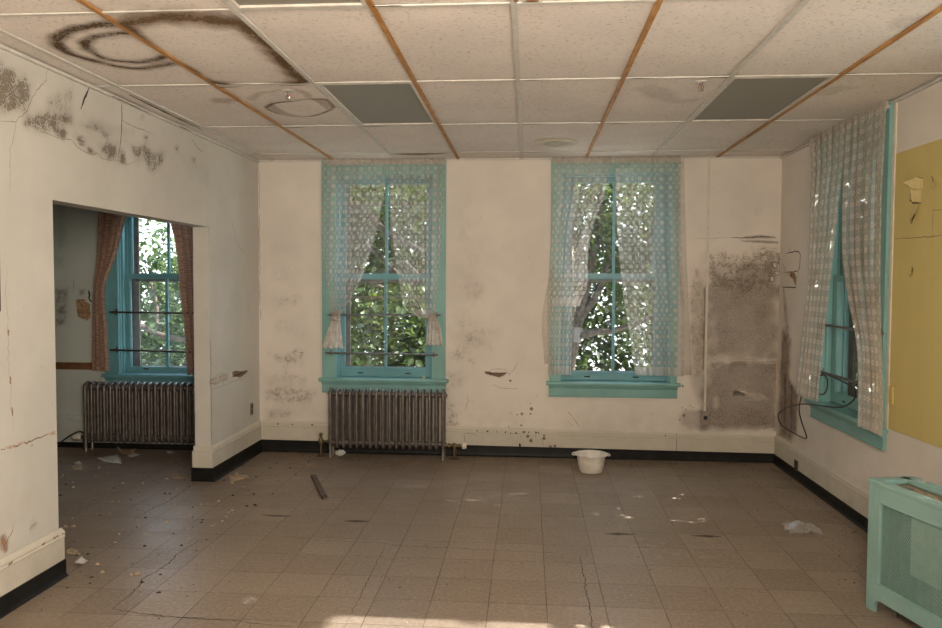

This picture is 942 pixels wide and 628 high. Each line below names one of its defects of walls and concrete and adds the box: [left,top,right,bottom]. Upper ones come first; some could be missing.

water stain [49,13,307,84]
water stain [690,246,797,437]
crack [113,540,291,628]